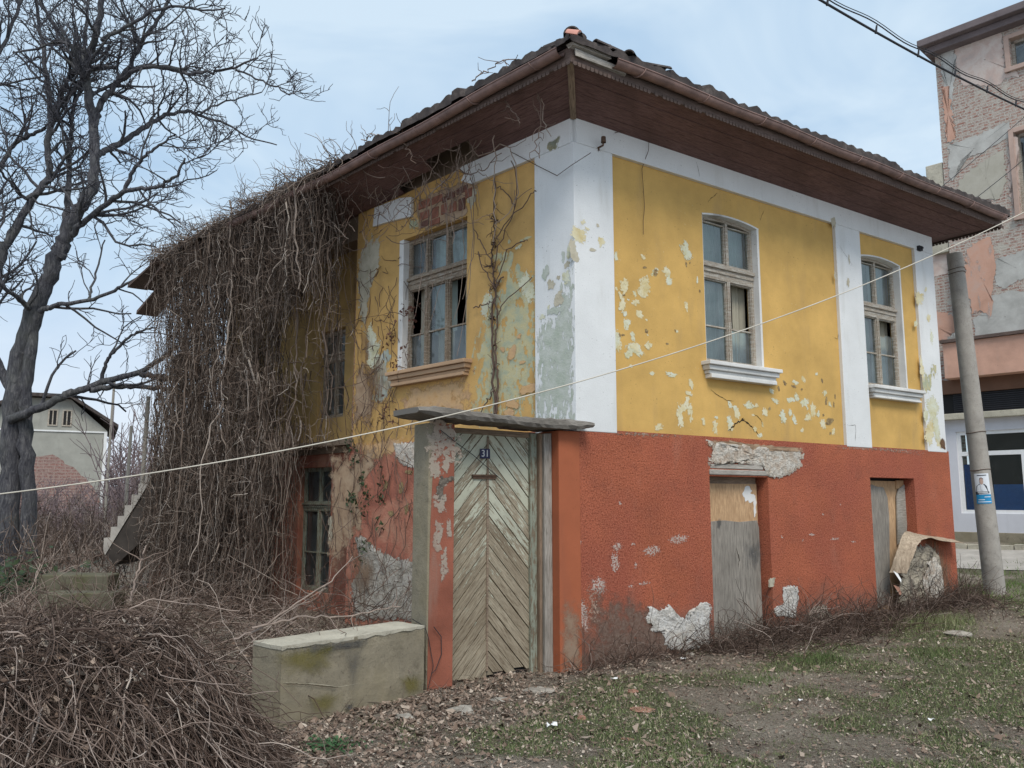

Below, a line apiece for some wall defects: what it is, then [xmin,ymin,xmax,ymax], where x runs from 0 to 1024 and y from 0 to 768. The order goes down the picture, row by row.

peeling [679,240,693,267]
peeling [615,254,673,368]
peeling [327,220,605,623]
crack [714,392,763,434]
spalling [649,371,836,480]
peeling [920,355,946,450]
spalling [645,602,713,651]
spalling [768,578,799,618]